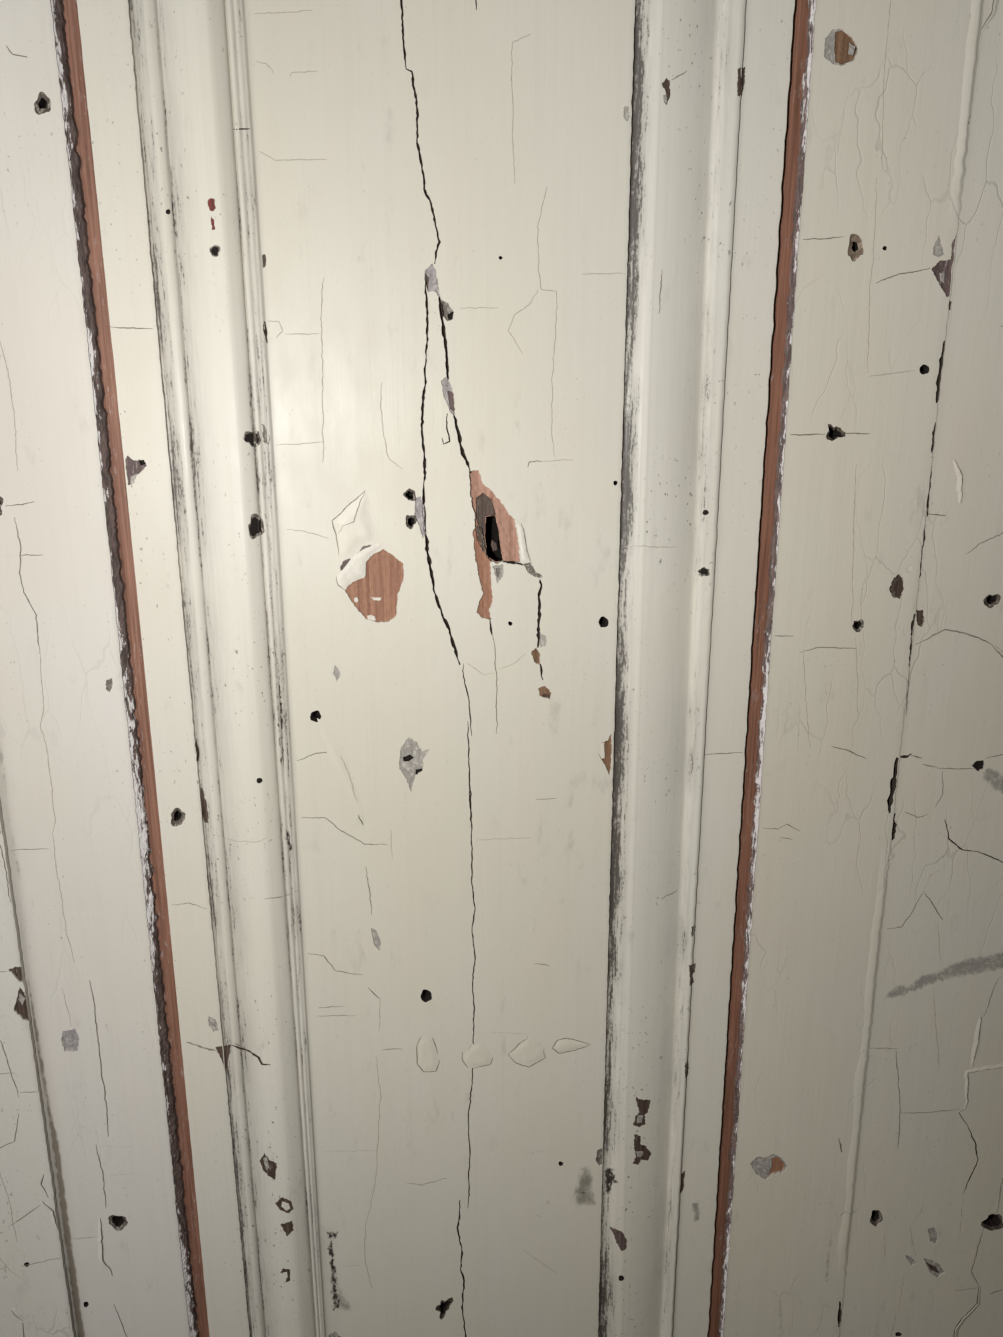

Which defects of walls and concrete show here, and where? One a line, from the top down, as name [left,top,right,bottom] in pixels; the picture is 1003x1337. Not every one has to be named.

crack [233,128,327,161]
peeling [662,78,670,105]
crack [0,342,18,471]
crack [263,278,324,458]
crack [867,2,963,578]
peeling [336,542,404,623]
crack [301,0,589,1337]
spalling [469,470,542,620]
spalling [718,0,859,1337]
peeling [399,738,430,792]
crack [0,502,127,1337]
crack [776,433,1003,1337]